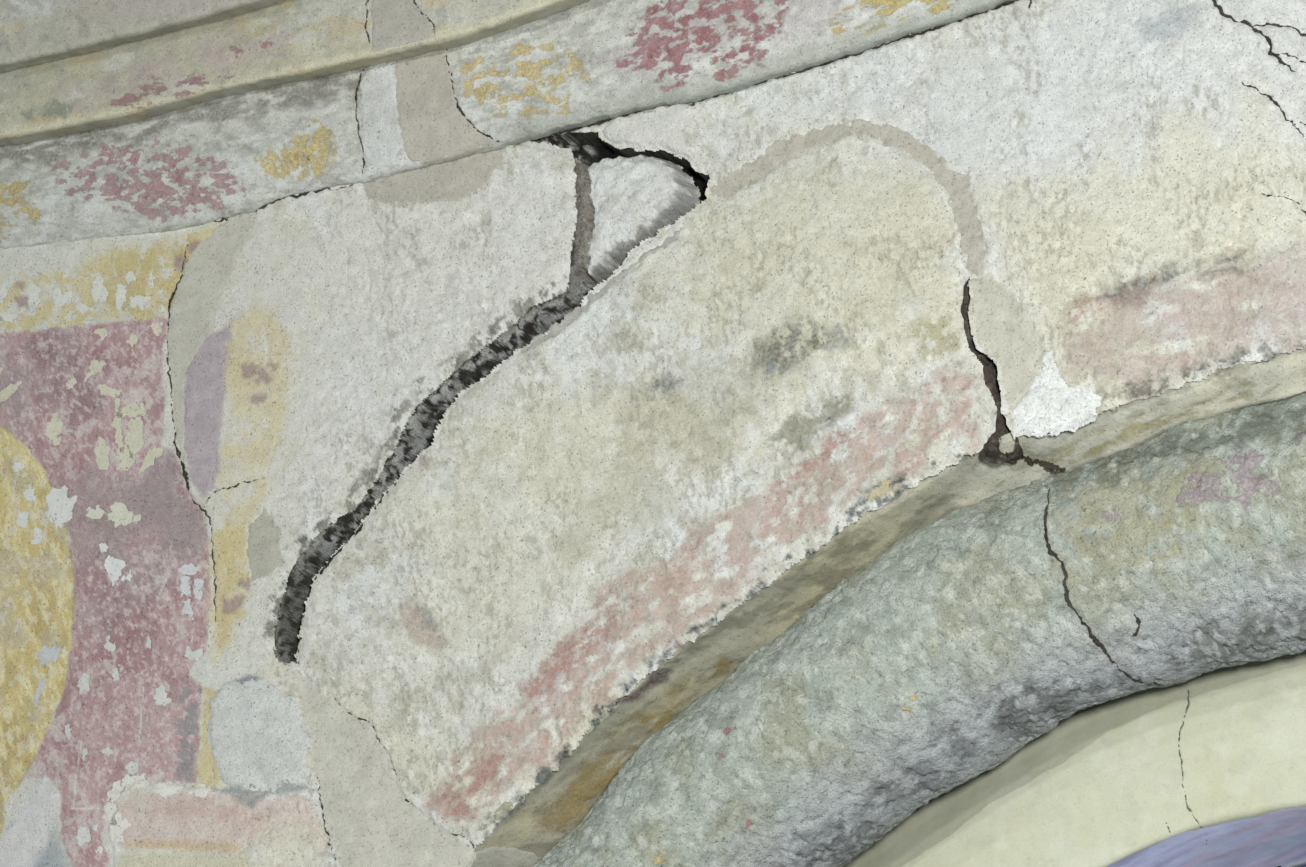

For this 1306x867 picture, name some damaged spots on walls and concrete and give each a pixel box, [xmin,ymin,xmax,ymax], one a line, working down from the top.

peeling [460,44,590,119]
crack [690,0,1032,106]
crack [1212,0,1306,72]
crack [1241,82,1306,137]
peeling [527,0,788,351]
crack [263,0,710,665]
crack [166,239,264,621]
flaking render [1012,350,1103,438]
peeling [15,484,142,544]
peeling [99,543,132,586]
crack [961,278,1207,844]
peeling [76,761,215,854]